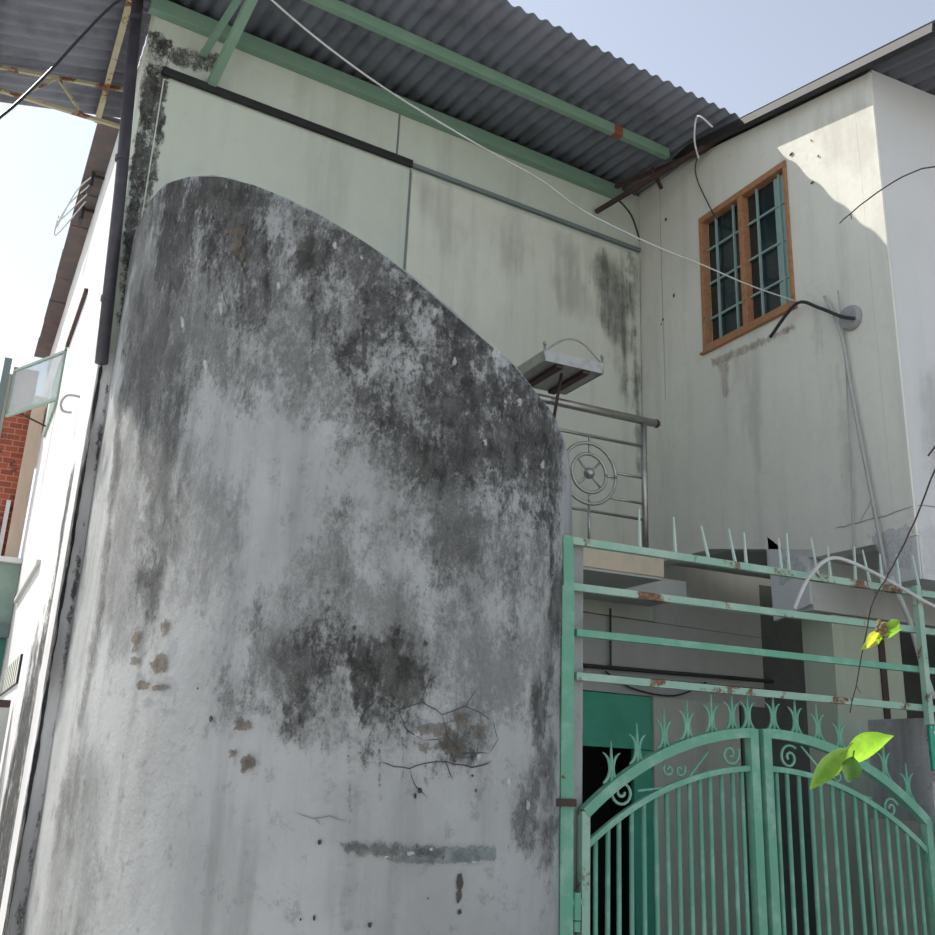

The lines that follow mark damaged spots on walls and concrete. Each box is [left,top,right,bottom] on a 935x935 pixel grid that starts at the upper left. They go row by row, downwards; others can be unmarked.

water stain [600,257,631,351]
water stain [116,31,564,883]
flaking render [130,630,142,665]
flaking render [150,653,167,674]
flaking render [136,680,169,691]
crack [358,672,498,797]
peeling [343,840,496,864]